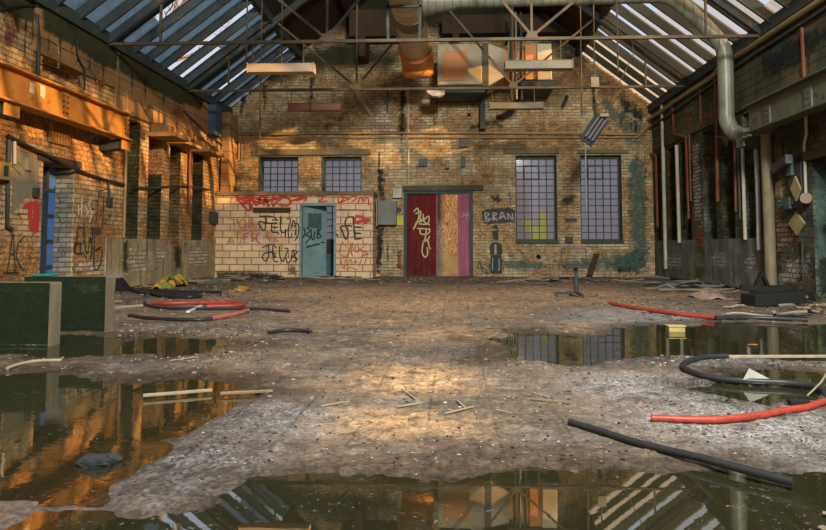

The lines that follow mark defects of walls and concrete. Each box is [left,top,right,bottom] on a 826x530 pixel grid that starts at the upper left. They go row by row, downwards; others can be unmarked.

damp [761,26,826,76]